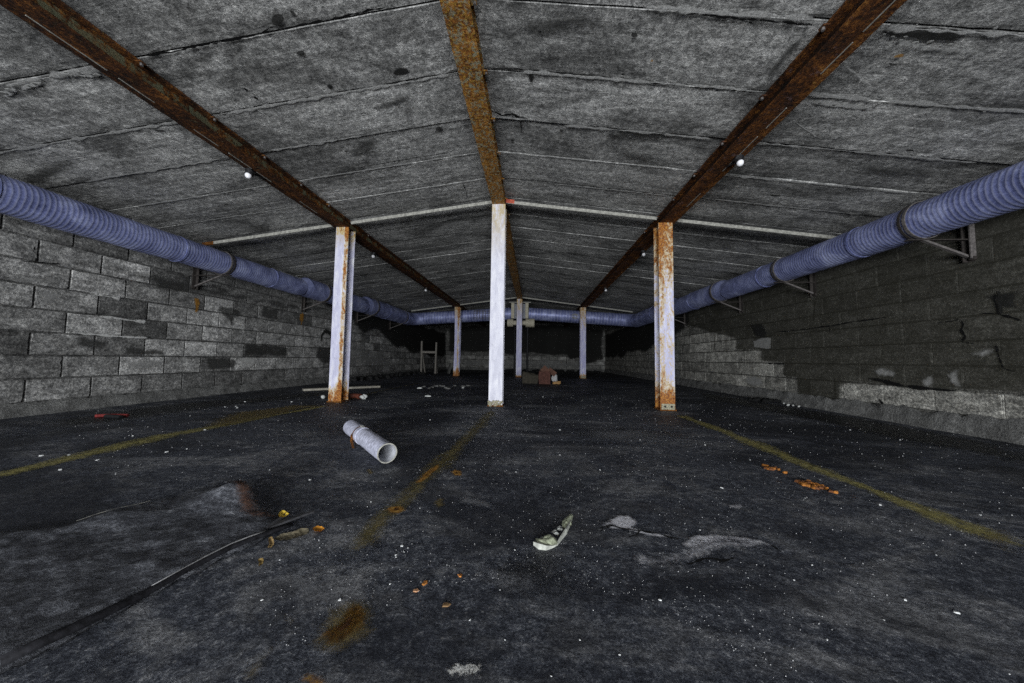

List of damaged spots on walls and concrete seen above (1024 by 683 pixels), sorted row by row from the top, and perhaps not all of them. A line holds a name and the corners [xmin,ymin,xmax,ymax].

crack [940,294,1021,371]
rust [323,606,363,645]